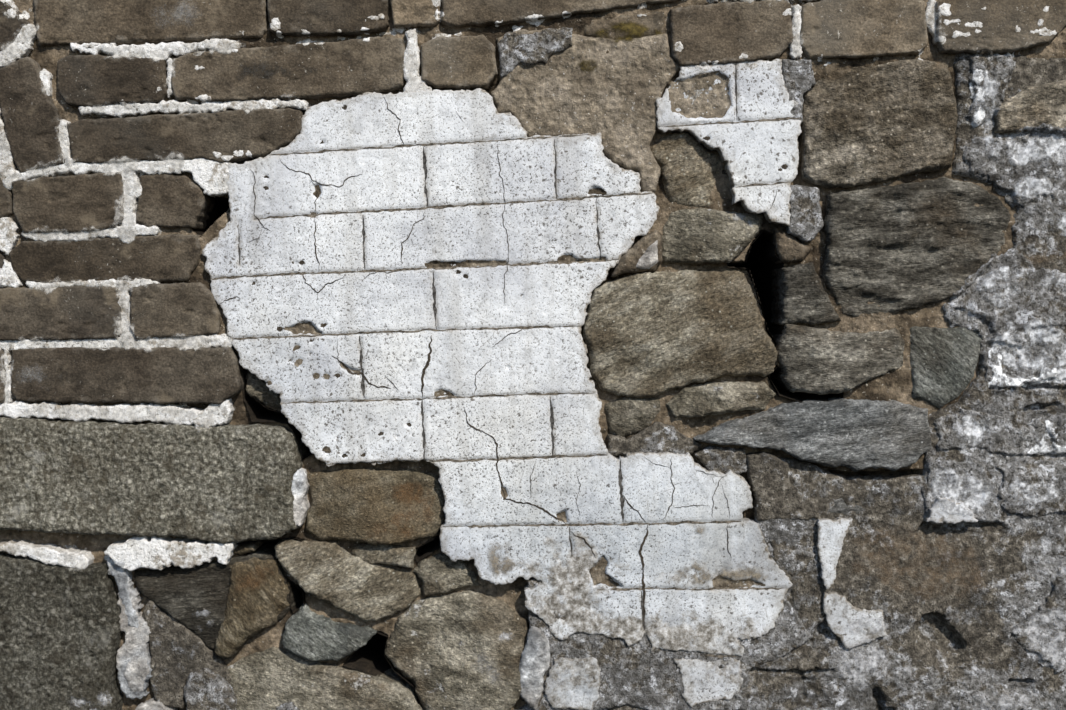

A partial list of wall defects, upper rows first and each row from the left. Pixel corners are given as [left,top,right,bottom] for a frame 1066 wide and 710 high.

crack [249,169,272,242]
crack [279,157,425,300]
crack [497,152,509,302]
flaking render [656,59,802,345]
crack [331,346,396,389]
crack [421,335,432,397]
flaking render [192,88,793,710]
crack [464,329,596,558]
spalling [767,366,844,402]
crack [623,458,731,627]